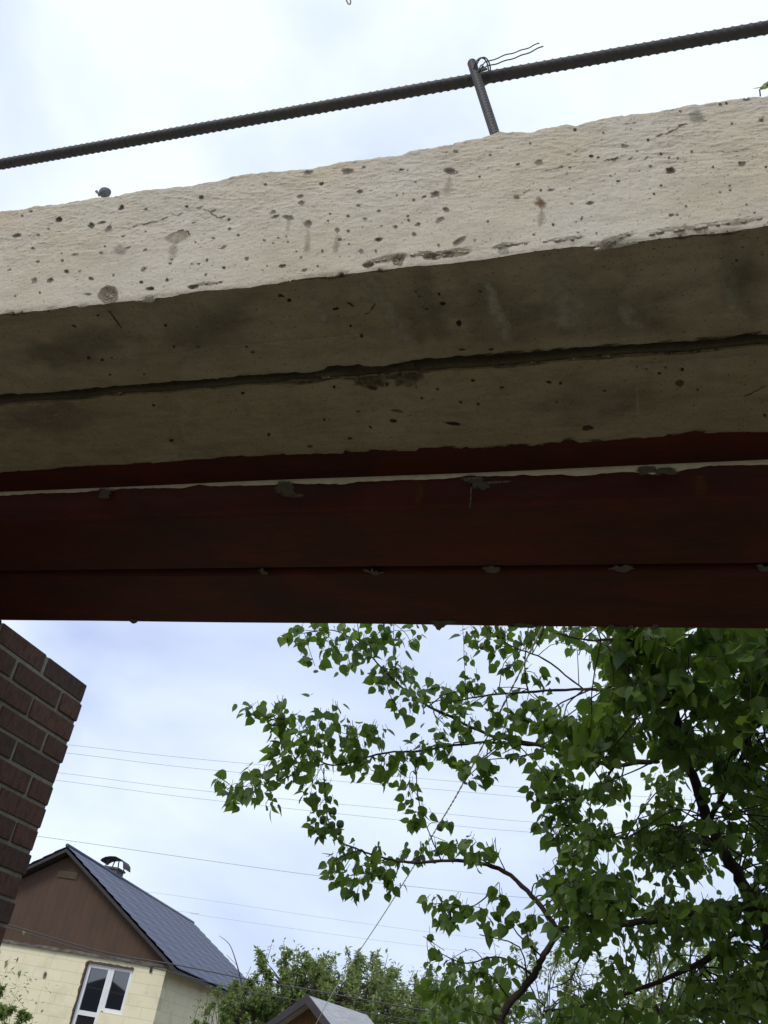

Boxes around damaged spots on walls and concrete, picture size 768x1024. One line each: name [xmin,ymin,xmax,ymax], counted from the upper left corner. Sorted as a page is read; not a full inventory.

spalling [493,201,594,249]
spalling [593,232,632,252]
spalling [649,203,763,249]